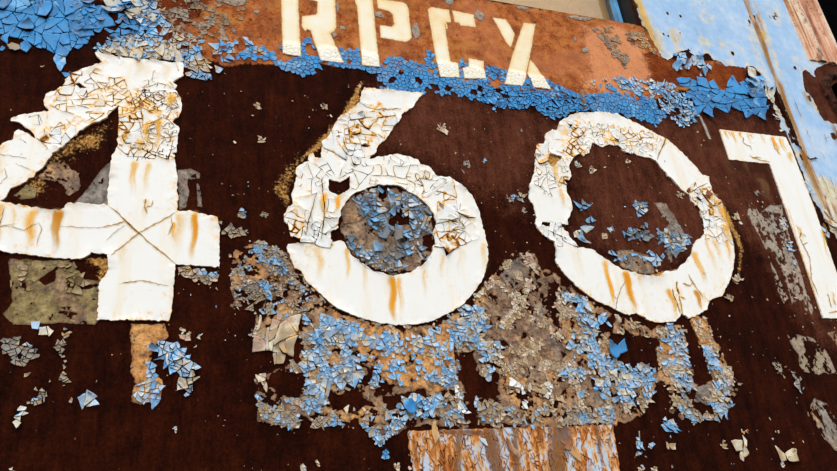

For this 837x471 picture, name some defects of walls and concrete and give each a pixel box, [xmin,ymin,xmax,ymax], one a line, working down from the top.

corrosion [755,21,770,62]
crack [31,68,178,160]
peeling [0,0,784,175]
corrosion [779,82,796,128]
crack [62,200,173,262]
crack [297,162,440,238]
peeling [285,178,471,275]
crack [438,204,476,231]
corrosion [771,137,819,189]
peeling [0,259,99,386]
peeling [130,323,203,409]
peeling [219,199,743,471]